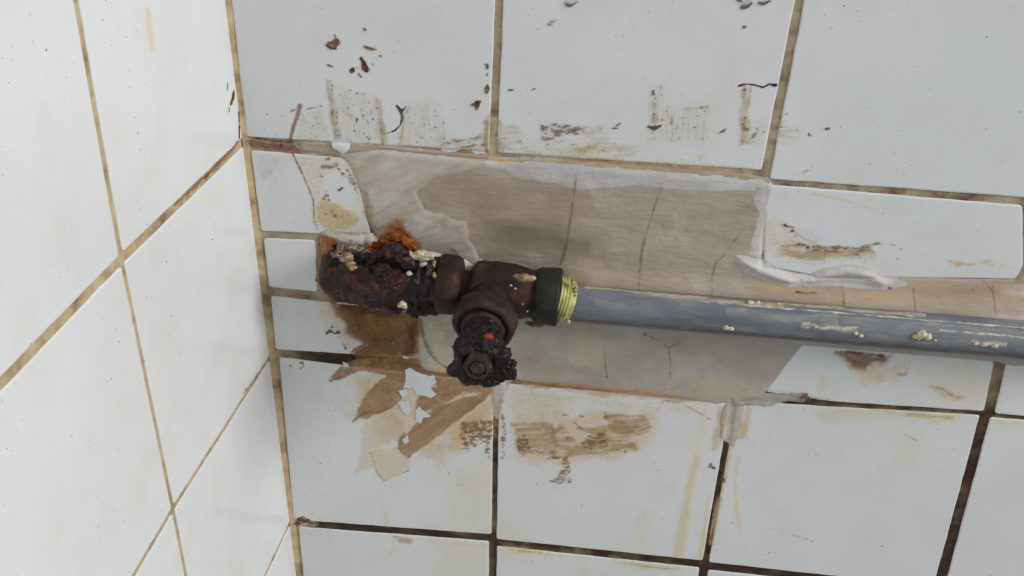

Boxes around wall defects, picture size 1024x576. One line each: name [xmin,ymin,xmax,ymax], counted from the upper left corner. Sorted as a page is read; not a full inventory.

water stain [313,193,371,232]
corrosion [323,237,357,271]
spalling [329,253,366,268]
corrosion [365,219,420,265]
corrosion [325,295,503,458]
peeling [398,356,436,423]
corrosion [840,351,887,368]